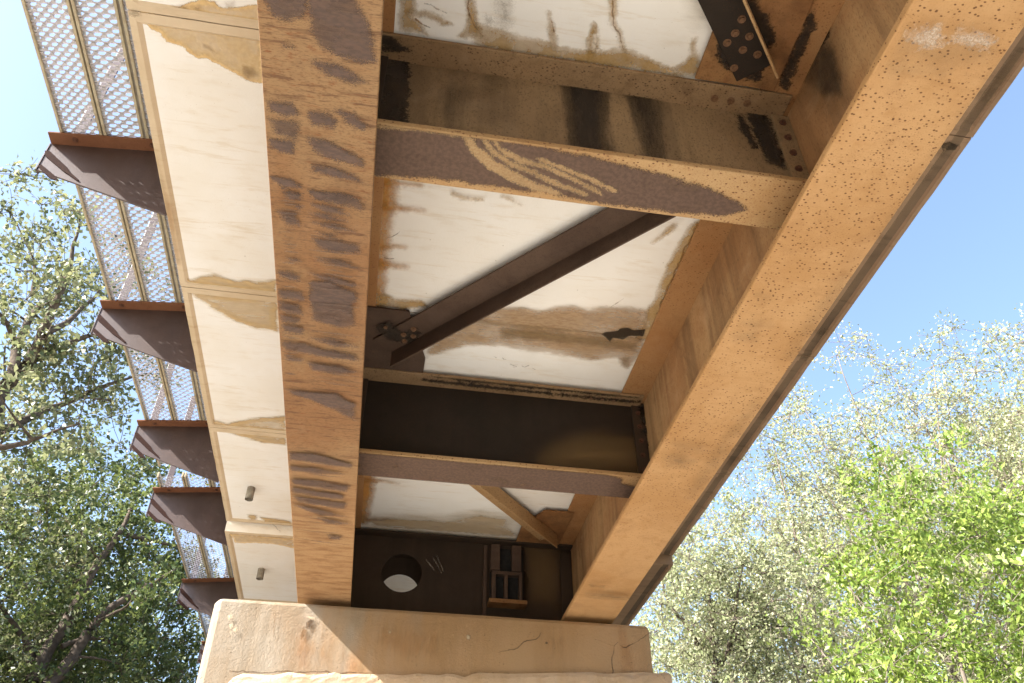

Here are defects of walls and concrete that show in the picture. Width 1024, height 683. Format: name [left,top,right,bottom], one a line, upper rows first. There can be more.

water stain [141,11,262,83]
water stain [747,0,776,49]
rust [379,125,617,198]
water stain [180,0,747,421]
water stain [213,416,635,548]